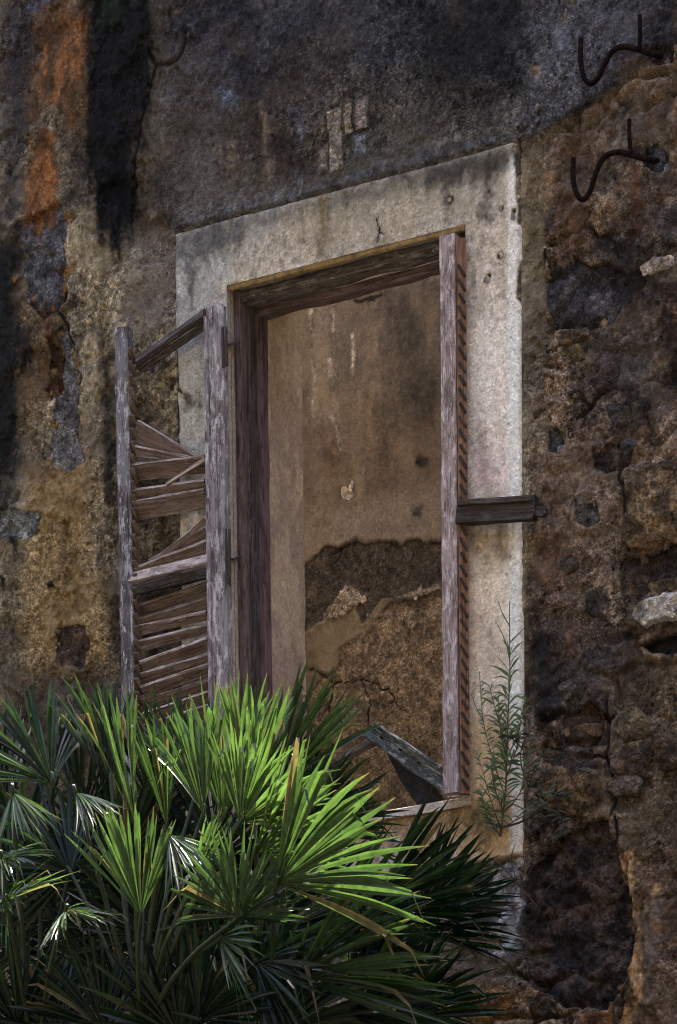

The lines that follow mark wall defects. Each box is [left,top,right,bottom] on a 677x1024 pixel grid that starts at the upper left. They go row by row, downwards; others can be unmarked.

corrosion [24,1,88,233]
leakage [82,0,153,264]
spalling [547,254,628,330]
peeling [44,330,85,471]
spalling [549,426,564,454]
spalling [592,439,631,473]
spalling [574,496,599,528]
spalling [618,542,677,611]
crack [307,668,404,725]
peeling [304,539,443,813]
spalling [642,636,677,657]
spalling [474,815,634,1012]